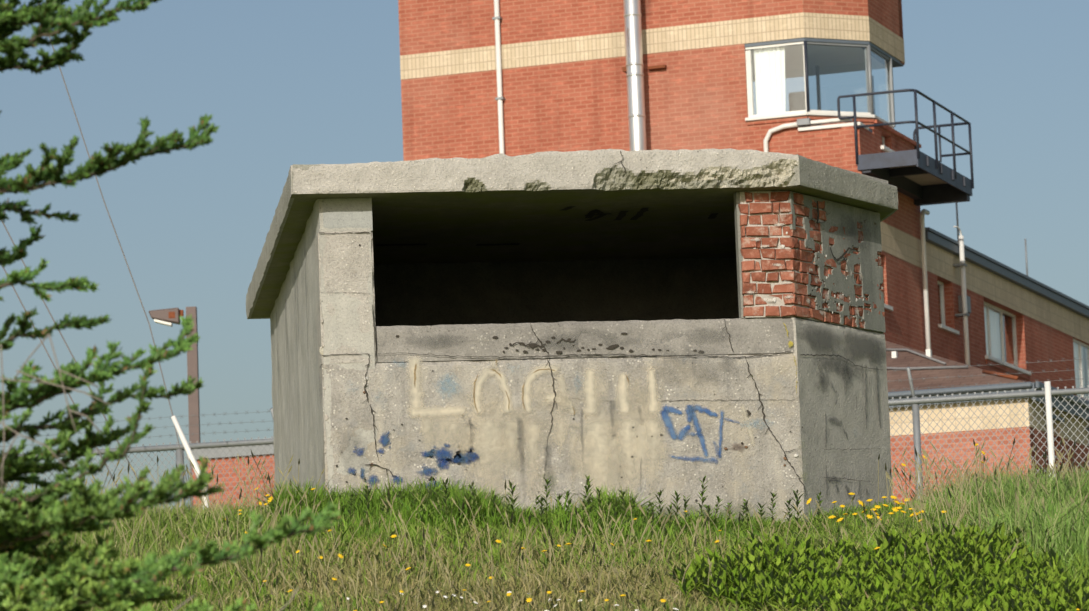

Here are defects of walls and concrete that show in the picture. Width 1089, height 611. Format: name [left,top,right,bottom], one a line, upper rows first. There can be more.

peeling [593,159,886,333]
crack [363,354,396,477]
crack [530,323,557,475]
crack [721,319,807,499]